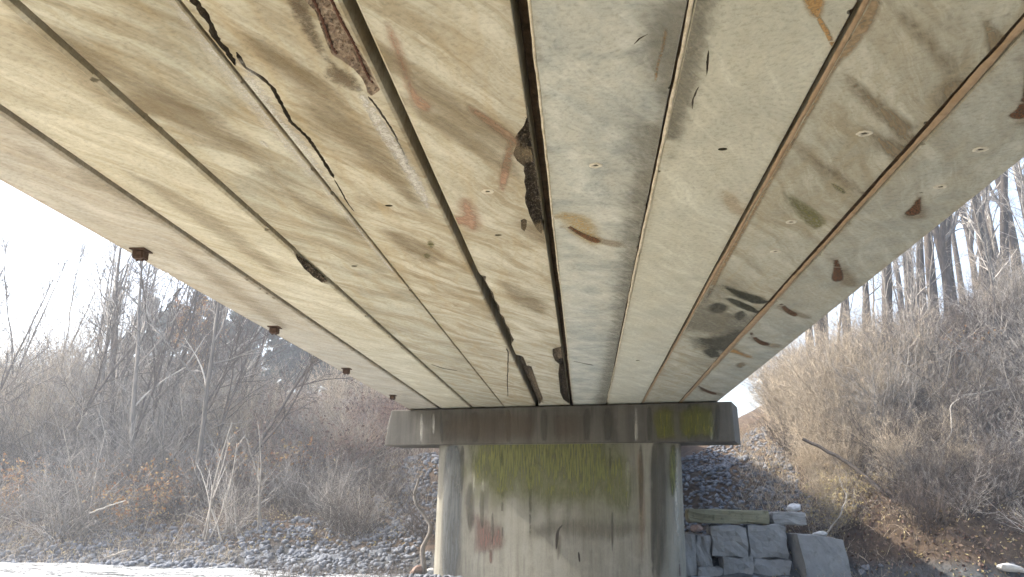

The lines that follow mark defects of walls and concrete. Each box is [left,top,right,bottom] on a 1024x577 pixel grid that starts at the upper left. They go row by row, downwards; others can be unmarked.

spalling [305,0,380,96]
crack [189,0,354,211]
crack [368,96,410,170]
corrosion [471,109,517,190]
spalling [513,117,543,233]
corrosion [560,215,613,244]
corrosion [709,0,878,293]
corrosion [905,192,922,217]
spalling [296,254,328,283]
damp [686,288,768,358]
spalling [518,355,543,404]
spalling [553,346,569,403]